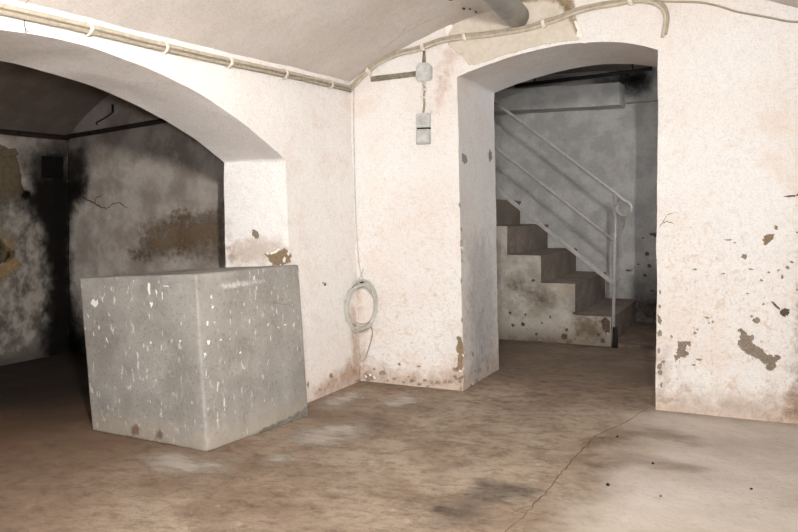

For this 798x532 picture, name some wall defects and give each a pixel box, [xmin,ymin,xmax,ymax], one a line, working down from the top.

peeling [0,144,24,206]
crack [83,195,128,210]
damp [0,147,100,355]
flaking render [265,248,292,265]
flaking render [760,225,778,245]
flaking render [737,328,781,370]
crack [505,408,647,532]